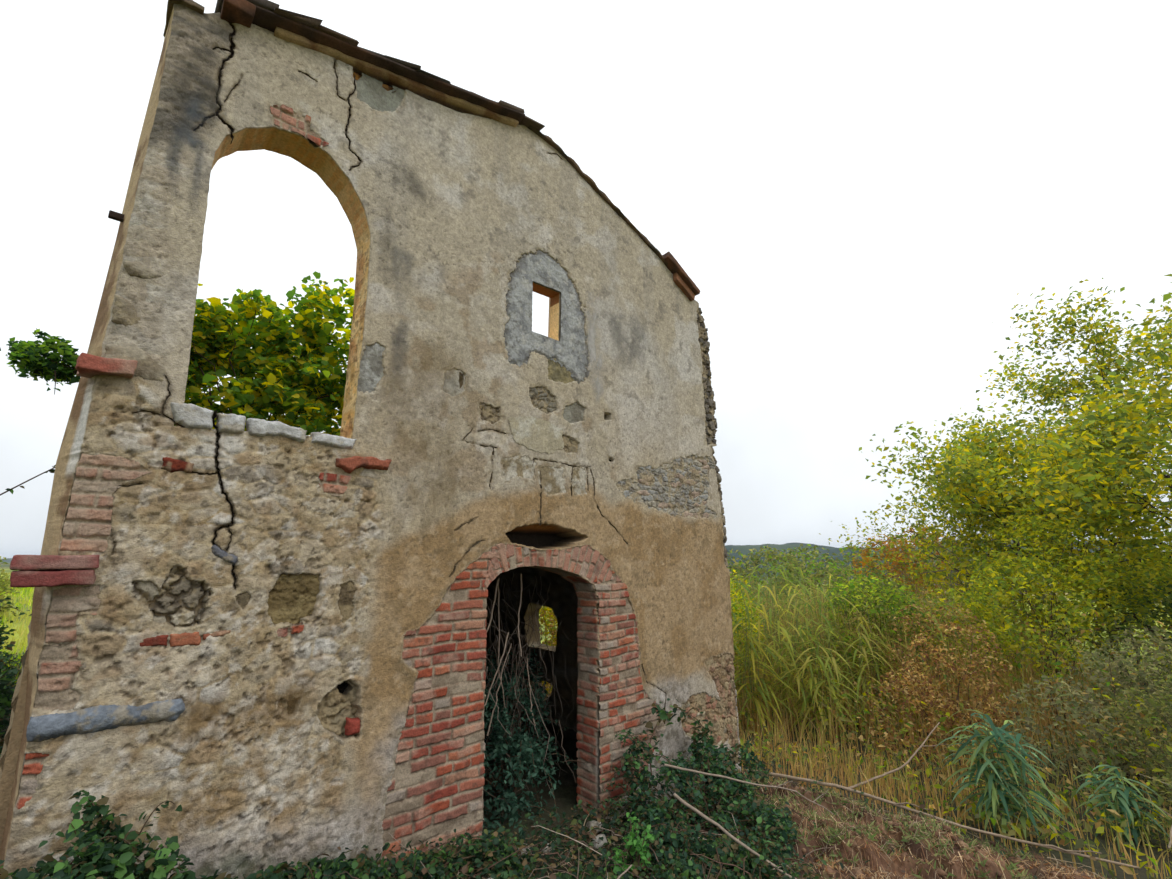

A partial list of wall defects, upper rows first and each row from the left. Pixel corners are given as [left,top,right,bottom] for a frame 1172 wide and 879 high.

crack [193,22,240,143]
flaking render [270,104,329,147]
crack [298,59,362,171]
flaking render [358,343,385,393]
crack [132,375,184,427]
flaking render [60,453,150,552]
crack [192,410,236,589]
spalling [134,567,210,628]
spalling [236,592,251,609]
spalling [267,574,320,637]
spalling [316,680,357,735]